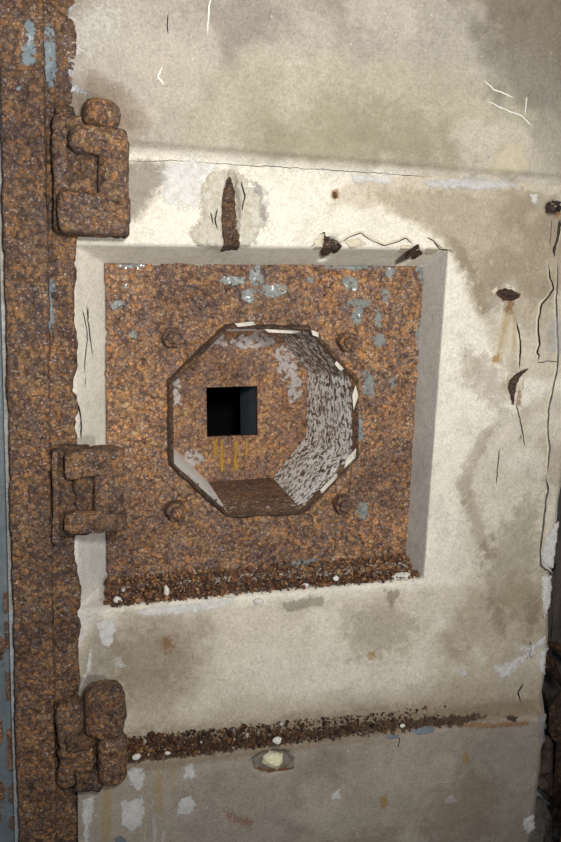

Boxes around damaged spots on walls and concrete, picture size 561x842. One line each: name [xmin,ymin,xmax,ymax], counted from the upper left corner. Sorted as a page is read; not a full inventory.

damp [68,0,133,96]
spalling [189,169,266,254]
crack [311,230,452,251]
crack [514,220,561,573]
rust [213,438,248,473]
spalling [252,737,294,773]